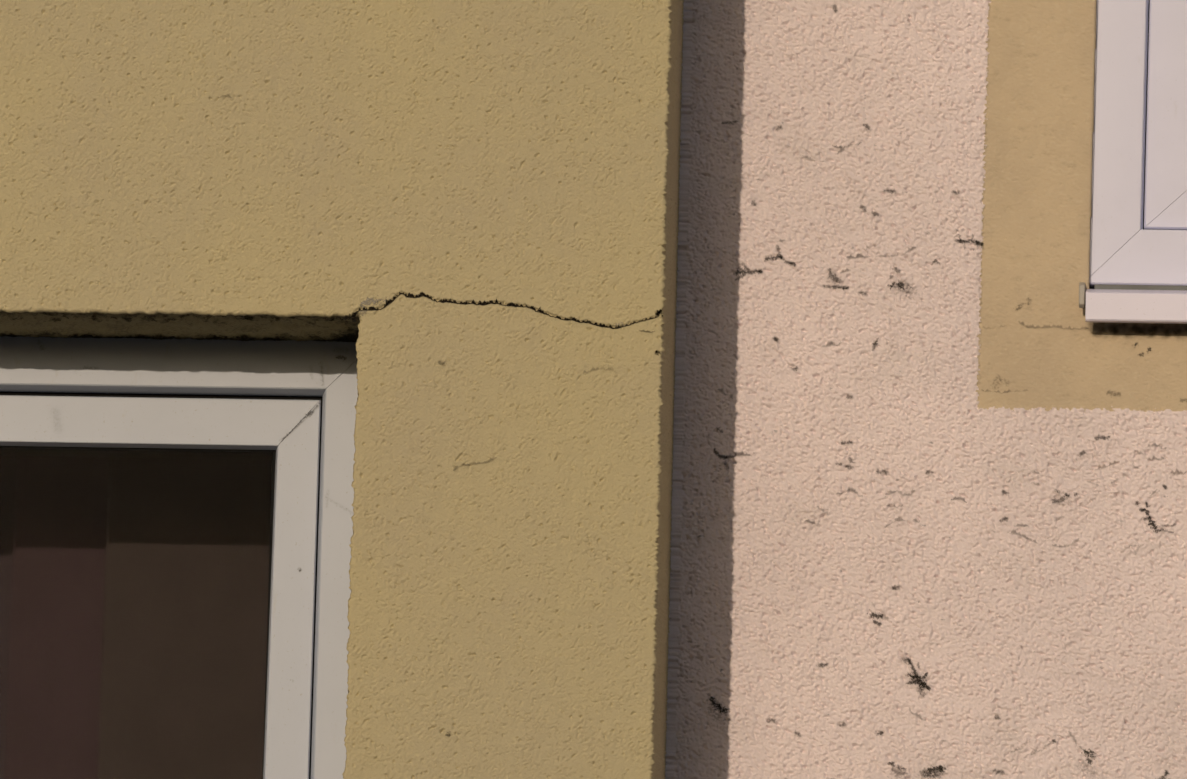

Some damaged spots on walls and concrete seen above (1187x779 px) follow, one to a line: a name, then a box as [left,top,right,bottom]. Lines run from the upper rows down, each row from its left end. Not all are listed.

crack [354,292,659,329]